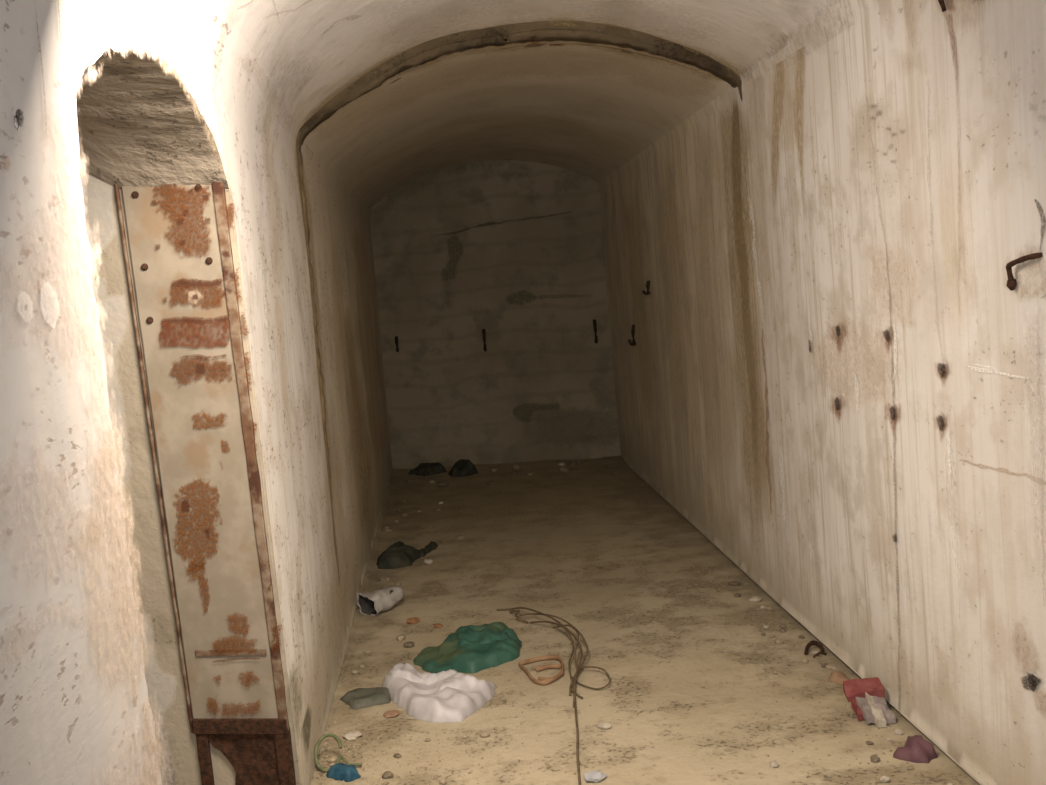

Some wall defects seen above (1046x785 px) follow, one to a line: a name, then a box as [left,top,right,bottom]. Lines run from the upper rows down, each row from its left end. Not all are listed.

peeling [80,171,115,261]
corrosion [226,203,235,229]
corrosion [160,267,249,384]
peeling [93,282,129,486]
corrosion [193,412,226,429]
corrosion [173,479,220,612]
corrosion [212,613,260,687]
peeling [138,619,175,785]
corrosion [207,697,261,716]